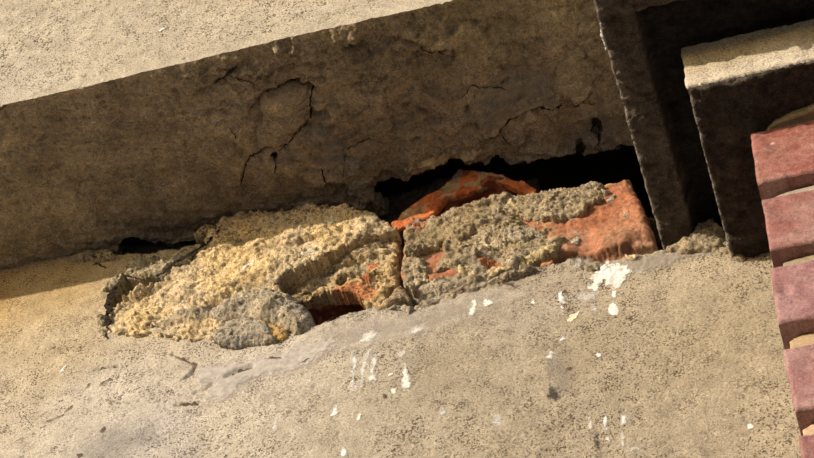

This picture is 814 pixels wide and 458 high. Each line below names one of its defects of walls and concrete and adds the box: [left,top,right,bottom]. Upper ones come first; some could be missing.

crack [211,63,314,183]
flaking render [378,148,663,307]
flaking render [69,237,203,304]
damp [469,299,493,315]
damp [558,292,579,322]
damp [578,261,642,315]
damp [351,351,376,387]
damp [388,367,411,394]